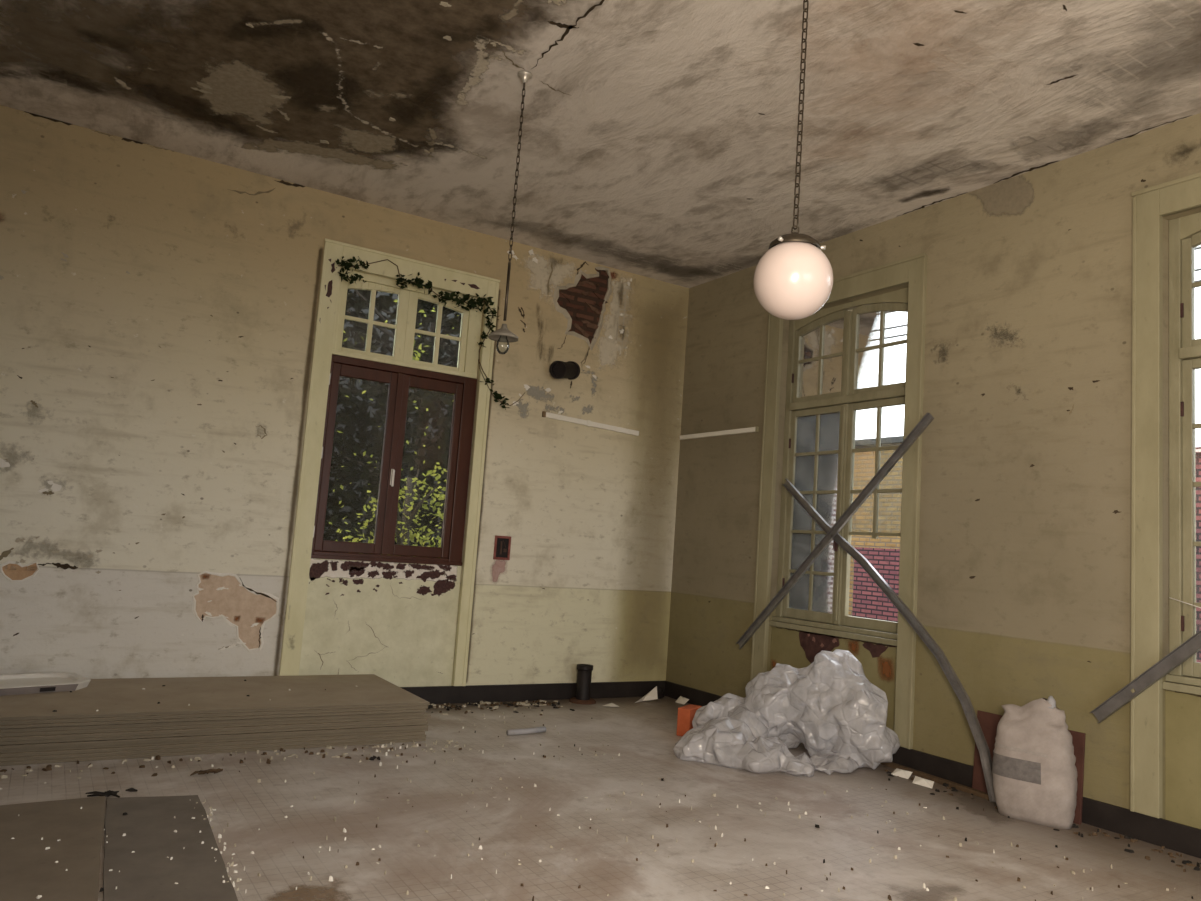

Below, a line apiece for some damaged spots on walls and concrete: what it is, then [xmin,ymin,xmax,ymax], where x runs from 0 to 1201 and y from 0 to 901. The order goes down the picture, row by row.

leakage [0,0,546,160]
crack [502,0,605,95]
flaking render [507,249,632,380]
flaking render [0,536,103,583]
flaking render [192,571,279,652]
peeling [309,558,457,596]
peeling [799,631,897,680]